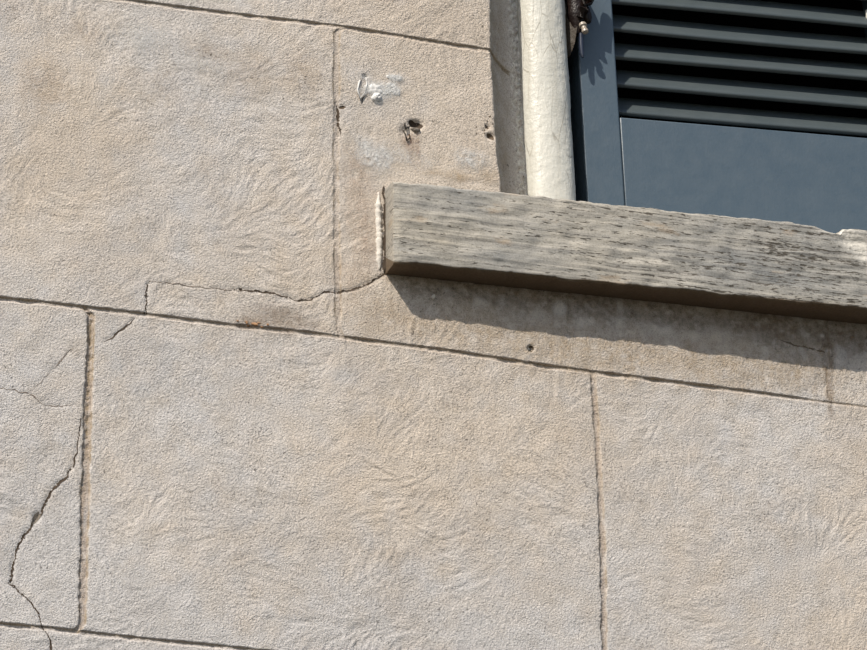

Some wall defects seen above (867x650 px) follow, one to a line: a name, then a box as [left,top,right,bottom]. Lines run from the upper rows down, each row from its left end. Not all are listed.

crack [104,186,386,342]
crack [0,347,81,650]